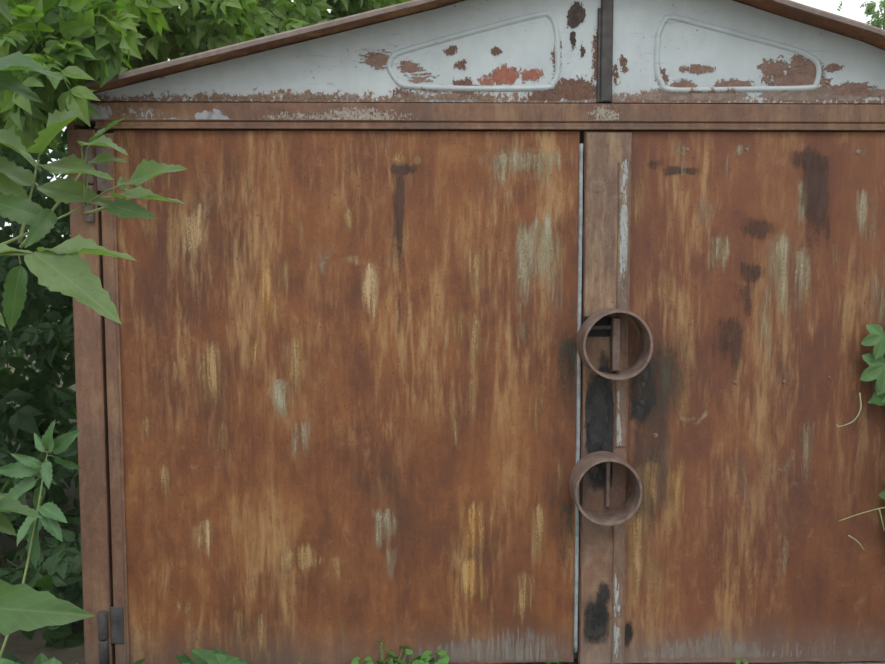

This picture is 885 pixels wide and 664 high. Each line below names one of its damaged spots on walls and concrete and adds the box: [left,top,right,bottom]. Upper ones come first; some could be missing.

peeling [359,26,619,121]
peeling [612,54,629,86]
peeling [655,54,877,97]
peeling [89,103,231,120]
peeling [253,106,417,120]
rust [392,154,419,257]
rust [794,148,829,239]
rust [363,263,376,316]
rust [198,345,219,395]
rust [281,544,320,570]
rust [462,502,492,597]
rust [629,518,642,589]